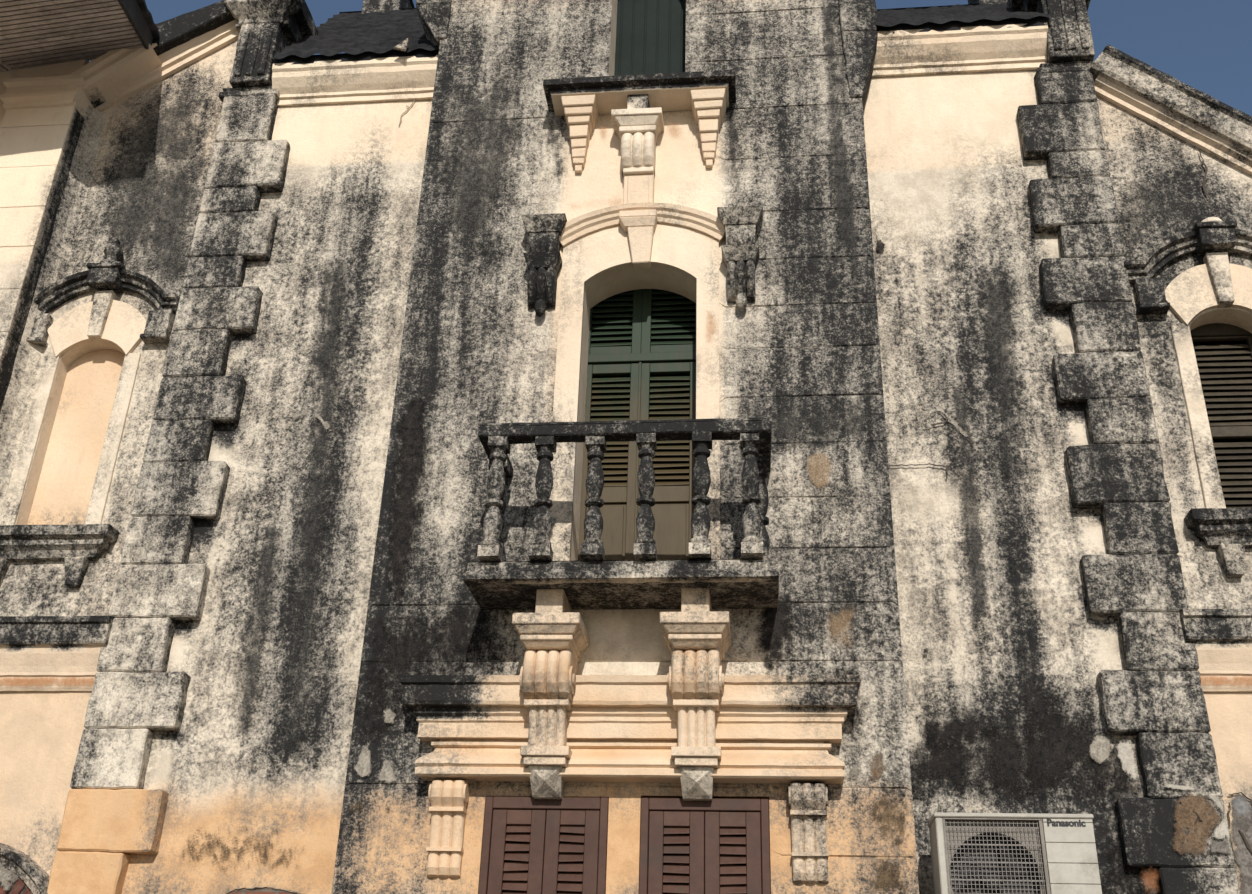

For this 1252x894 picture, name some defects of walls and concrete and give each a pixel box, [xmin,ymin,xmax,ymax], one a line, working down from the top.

water stain [101,80,216,314]
water stain [559,203,726,248]
water stain [34,265,93,314]
water stain [238,258,352,750]
water stain [386,394,431,599]
water stain [953,385,990,626]
water stain [756,595,795,670]
water stain [415,739,531,782]
water stain [558,740,683,783]
water stain [710,741,845,784]
water stain [871,611,1145,894]
flaking render [1163,784,1252,894]